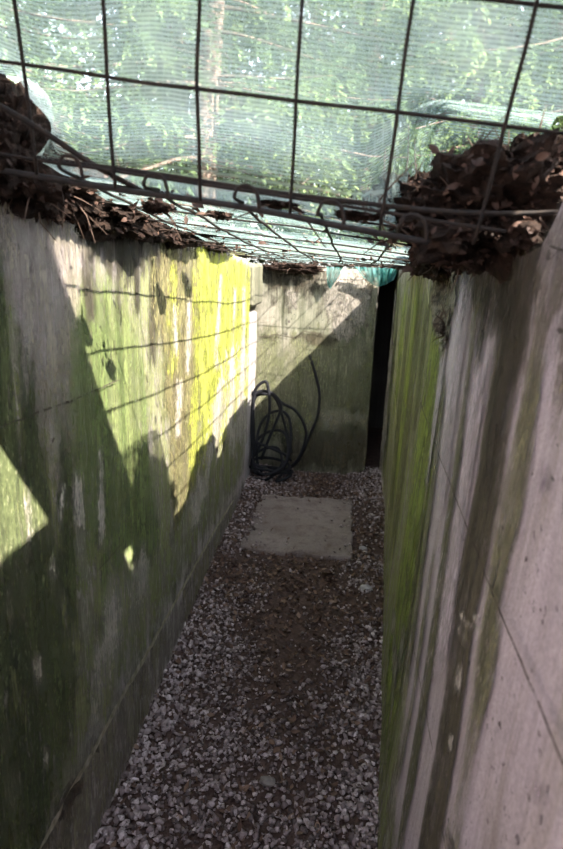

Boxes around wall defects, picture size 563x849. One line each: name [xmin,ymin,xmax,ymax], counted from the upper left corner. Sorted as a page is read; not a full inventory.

damp [18,325,79,718]
damp [82,239,96,327]
damp [96,306,111,650]
damp [120,317,149,561]
damp [115,236,160,365]
damp [45,483,244,849]
damp [268,275,327,317]
damp [273,278,377,475]
damp [384,273,490,849]
damp [418,209,563,849]
crack [426,418,563,765]